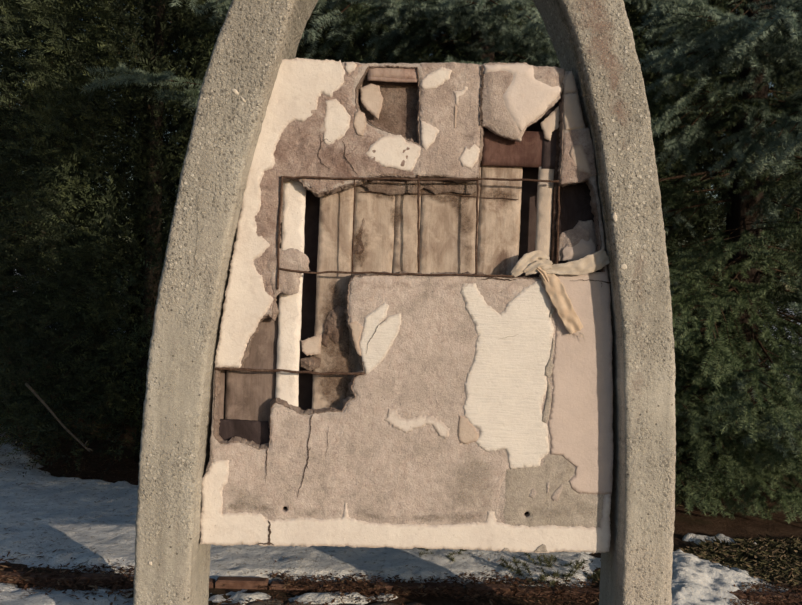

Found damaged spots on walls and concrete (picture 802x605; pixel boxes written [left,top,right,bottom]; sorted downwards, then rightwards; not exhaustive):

crack [317,138,357,174]
flaking render [233,62,484,368]
water stain [320,320,356,407]
flaking render [211,271,603,528]
crack [297,415,329,497]